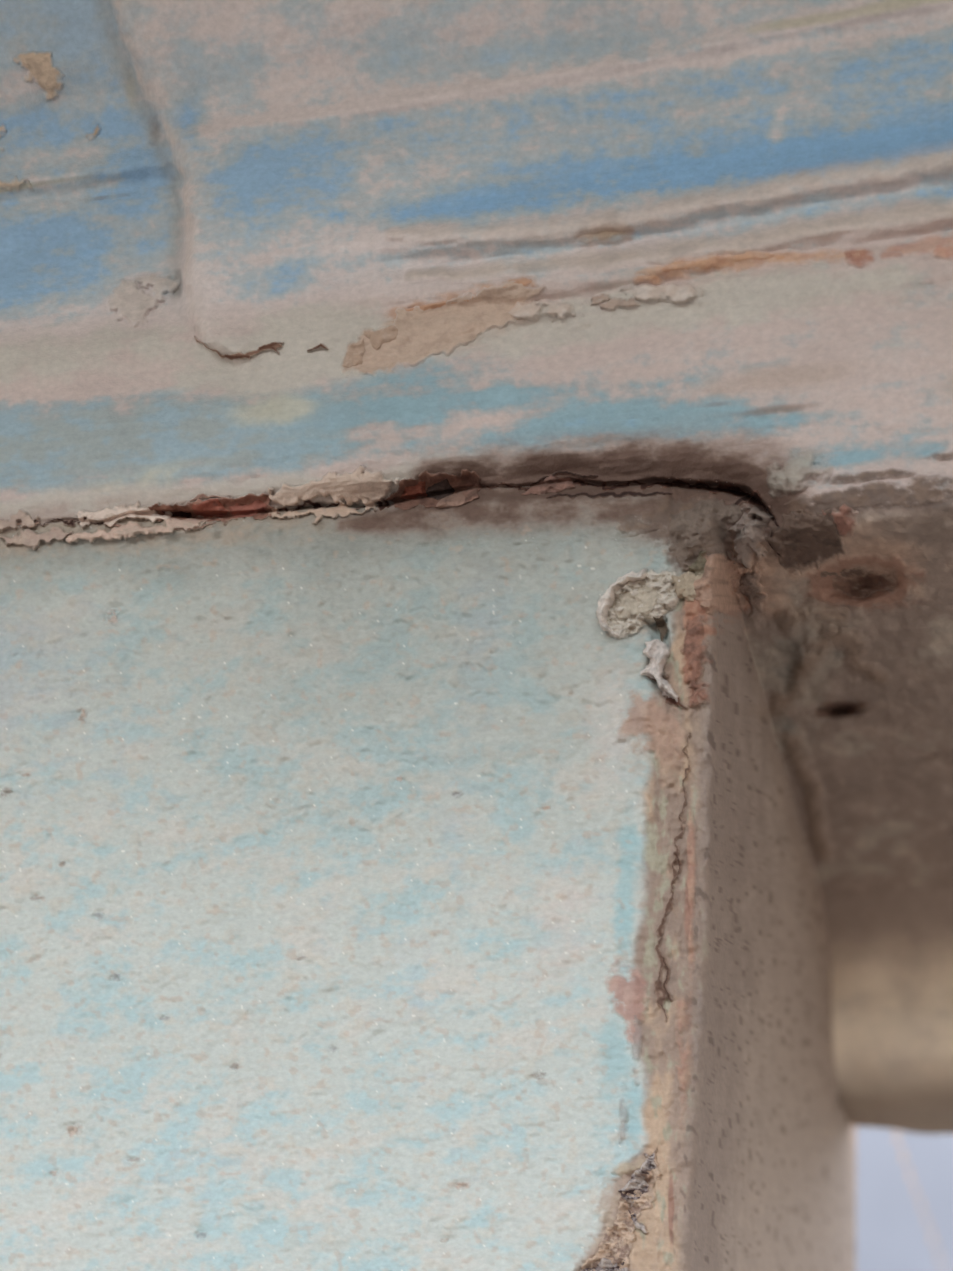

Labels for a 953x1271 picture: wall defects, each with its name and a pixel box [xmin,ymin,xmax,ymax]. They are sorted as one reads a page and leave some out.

peeling [11,50,66,102]
spalling [339,281,706,379]
crack [18,492,394,531]
peeling [0,465,483,551]
spalling [521,474,576,496]
crack [479,470,780,556]
water stain [331,407,953,579]
corrosion [793,551,937,617]
crack [654,731,692,1022]
spalling [580,1147,662,1271]